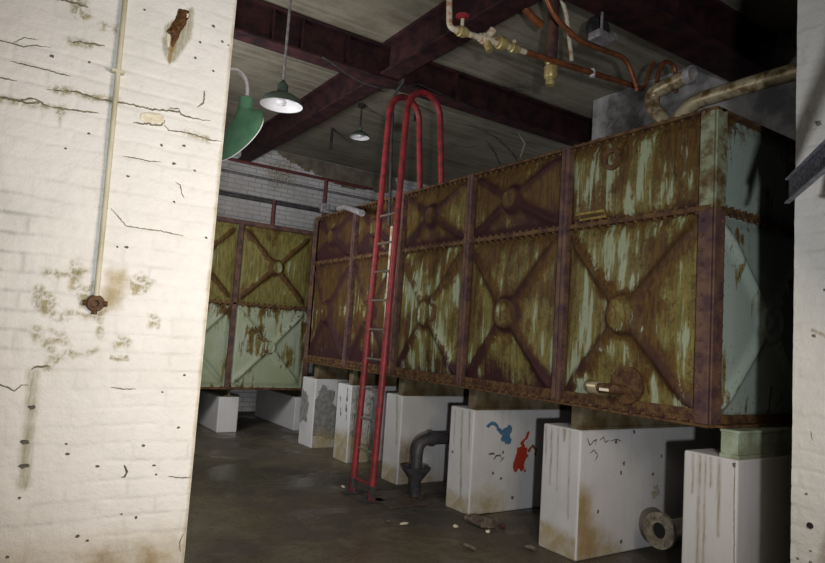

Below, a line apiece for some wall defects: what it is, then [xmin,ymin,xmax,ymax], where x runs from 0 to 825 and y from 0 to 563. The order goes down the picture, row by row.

crack [57,0,116,47]
spalling [165,9,191,63]
crack [0,37,222,142]
crack [112,210,183,236]
crack [0,365,50,392]
spalling [300,385,374,445]